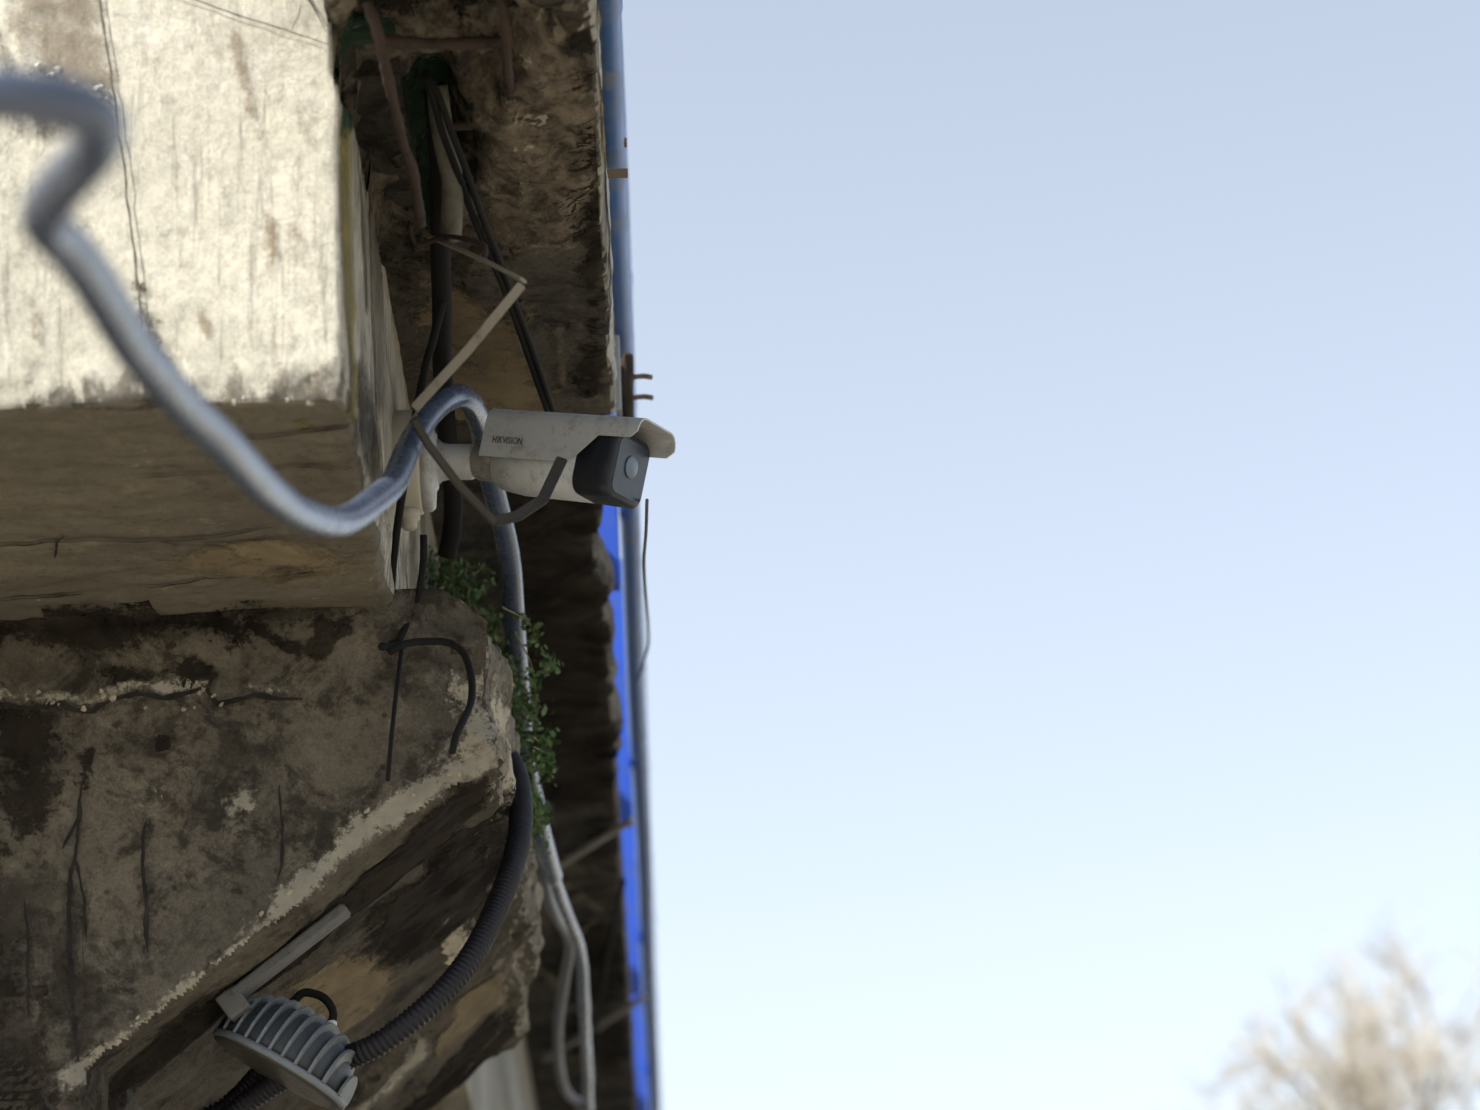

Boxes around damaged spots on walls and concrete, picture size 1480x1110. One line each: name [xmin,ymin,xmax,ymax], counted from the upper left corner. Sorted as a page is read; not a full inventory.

crack [99,0,117,100]
leakage [228,31,252,110]
crack [196,0,328,44]
spalling [327,0,599,251]
crack [122,152,150,330]
leakage [14,370,159,412]
spalling [0,679,303,714]
spalling [58,685,516,1091]